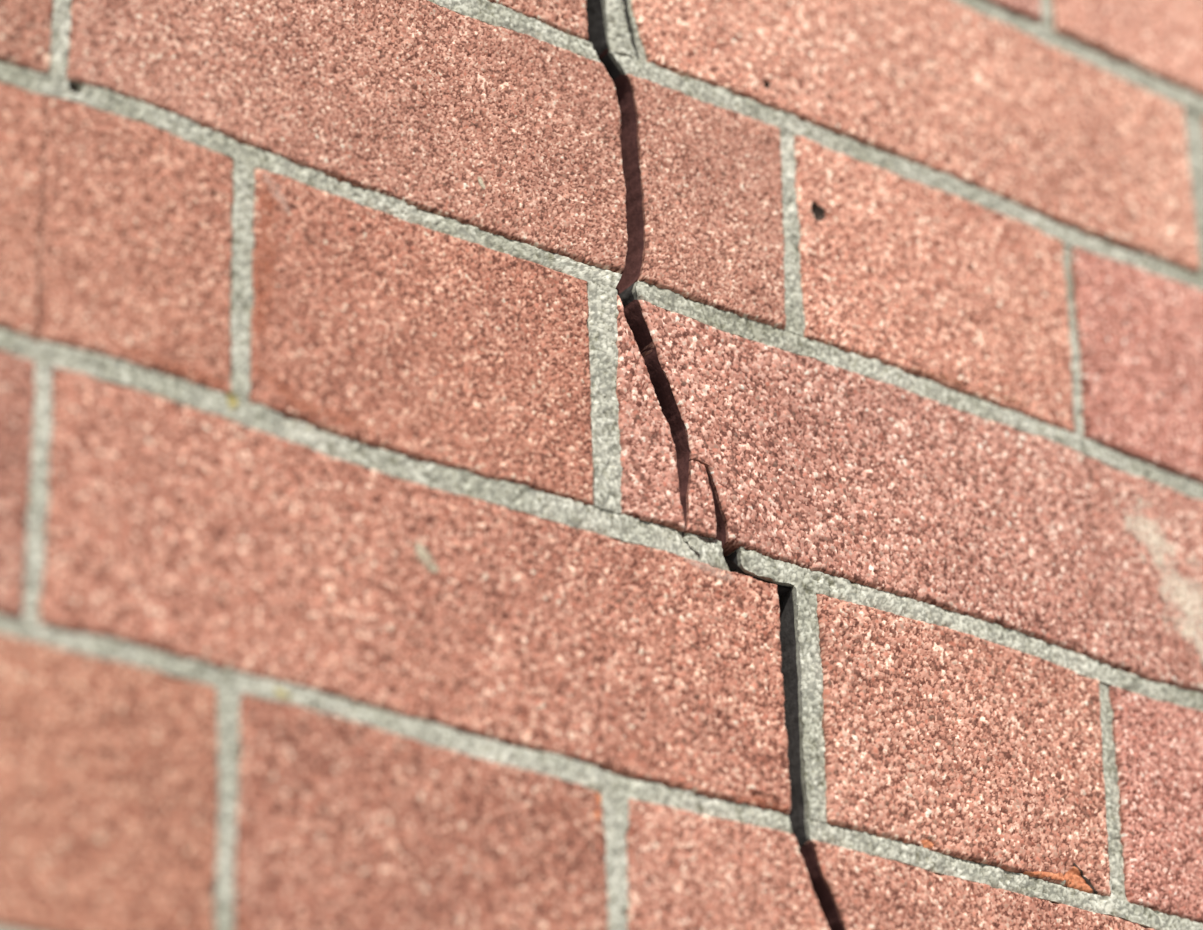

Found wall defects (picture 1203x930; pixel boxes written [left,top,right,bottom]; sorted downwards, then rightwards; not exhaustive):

crack [586,0,844,930]